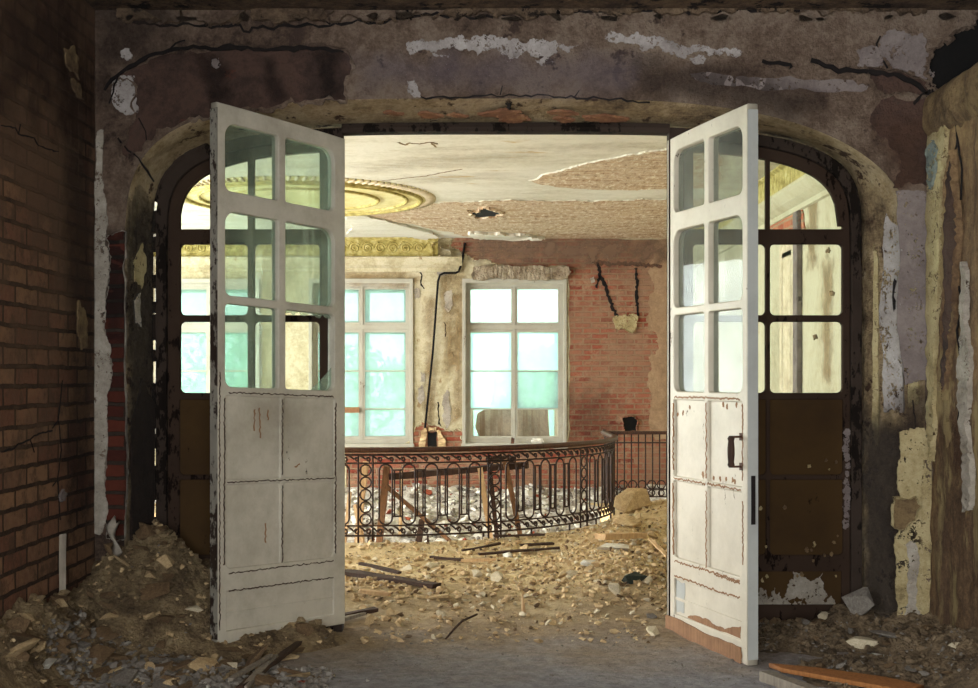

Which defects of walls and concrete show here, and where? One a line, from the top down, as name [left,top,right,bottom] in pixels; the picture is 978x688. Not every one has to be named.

crack [103,10,506,104]
peeling [406,34,574,66]
crack [539,9,653,17]
crack [761,36,938,105]
spalling [76,129,147,542]
crack [594,260,662,317]
peeling [606,16,978,616]
spalling [218,148,744,630]